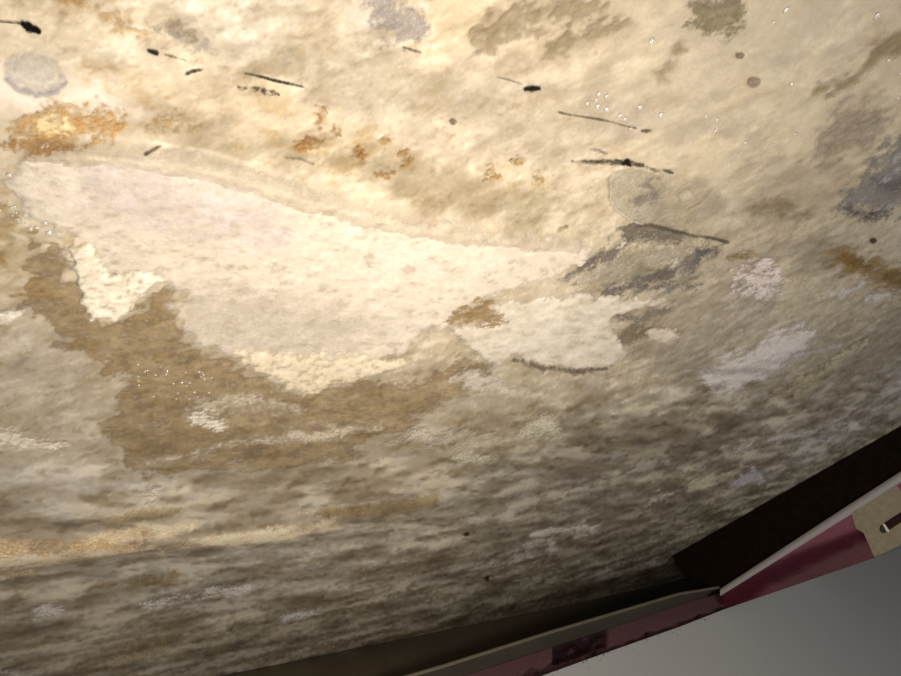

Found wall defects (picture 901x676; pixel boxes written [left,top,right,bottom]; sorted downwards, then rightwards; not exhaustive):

crack [0,21,42,34]
water stain [469,0,629,55]
corrosion [1,102,128,157]
corrosion [295,106,329,152]
crack [559,112,651,133]
crack [572,149,674,174]
efflorescence [730,257,791,305]
corrosion [818,246,901,295]
peeling [3,143,667,476]
peeling [645,328,680,343]
water stain [189,411,228,432]
efflorescence [384,412,562,468]